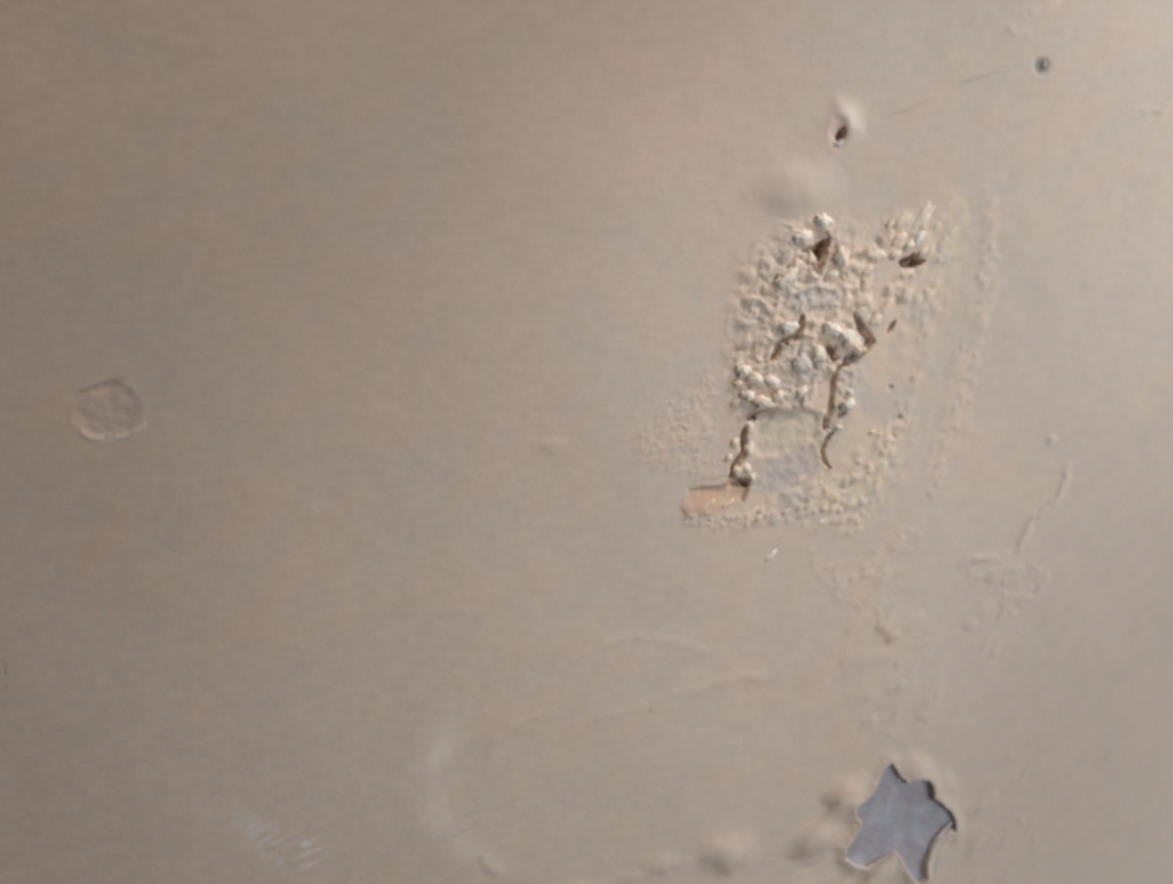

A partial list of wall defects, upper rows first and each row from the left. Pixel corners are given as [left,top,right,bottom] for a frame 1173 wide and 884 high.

hole [810,85,896,163]
flaking render [649,175,980,561]
spalling [761,746,970,884]